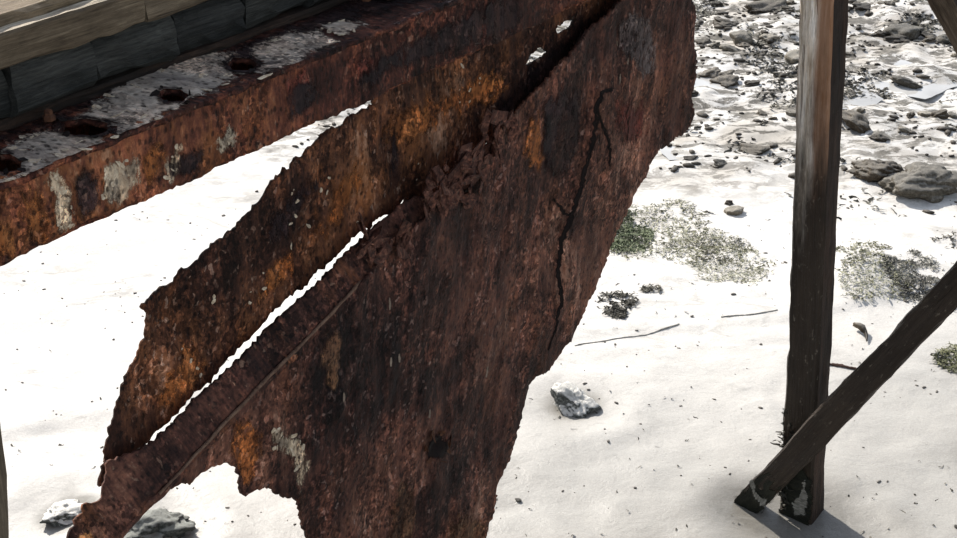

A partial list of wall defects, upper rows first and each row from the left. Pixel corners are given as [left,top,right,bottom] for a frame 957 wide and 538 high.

corrosion [211,0,424,63]
corrosion [382,13,601,221]
corrosion [19,191,51,244]
corrosion [69,168,99,219]
corrosion [143,142,204,186]
corrosion [269,172,323,243]
corrosion [317,156,412,268]
crack [548,87,630,351]
corrosion [258,252,293,302]
corrosion [158,346,206,406]
corrosion [322,333,342,389]
corrosion [229,421,263,485]